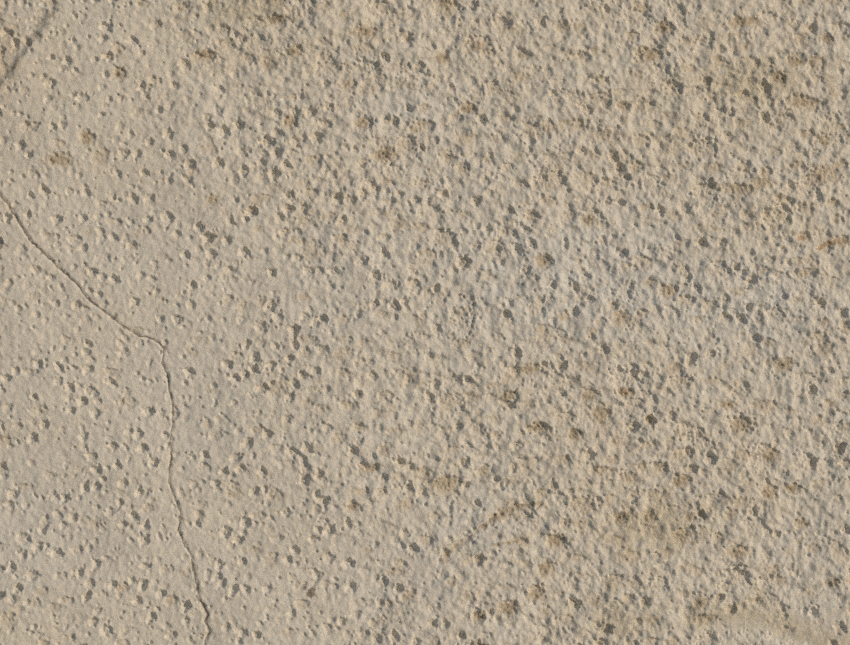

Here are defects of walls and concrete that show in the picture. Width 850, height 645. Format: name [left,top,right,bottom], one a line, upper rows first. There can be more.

crack [0,194,210,645]